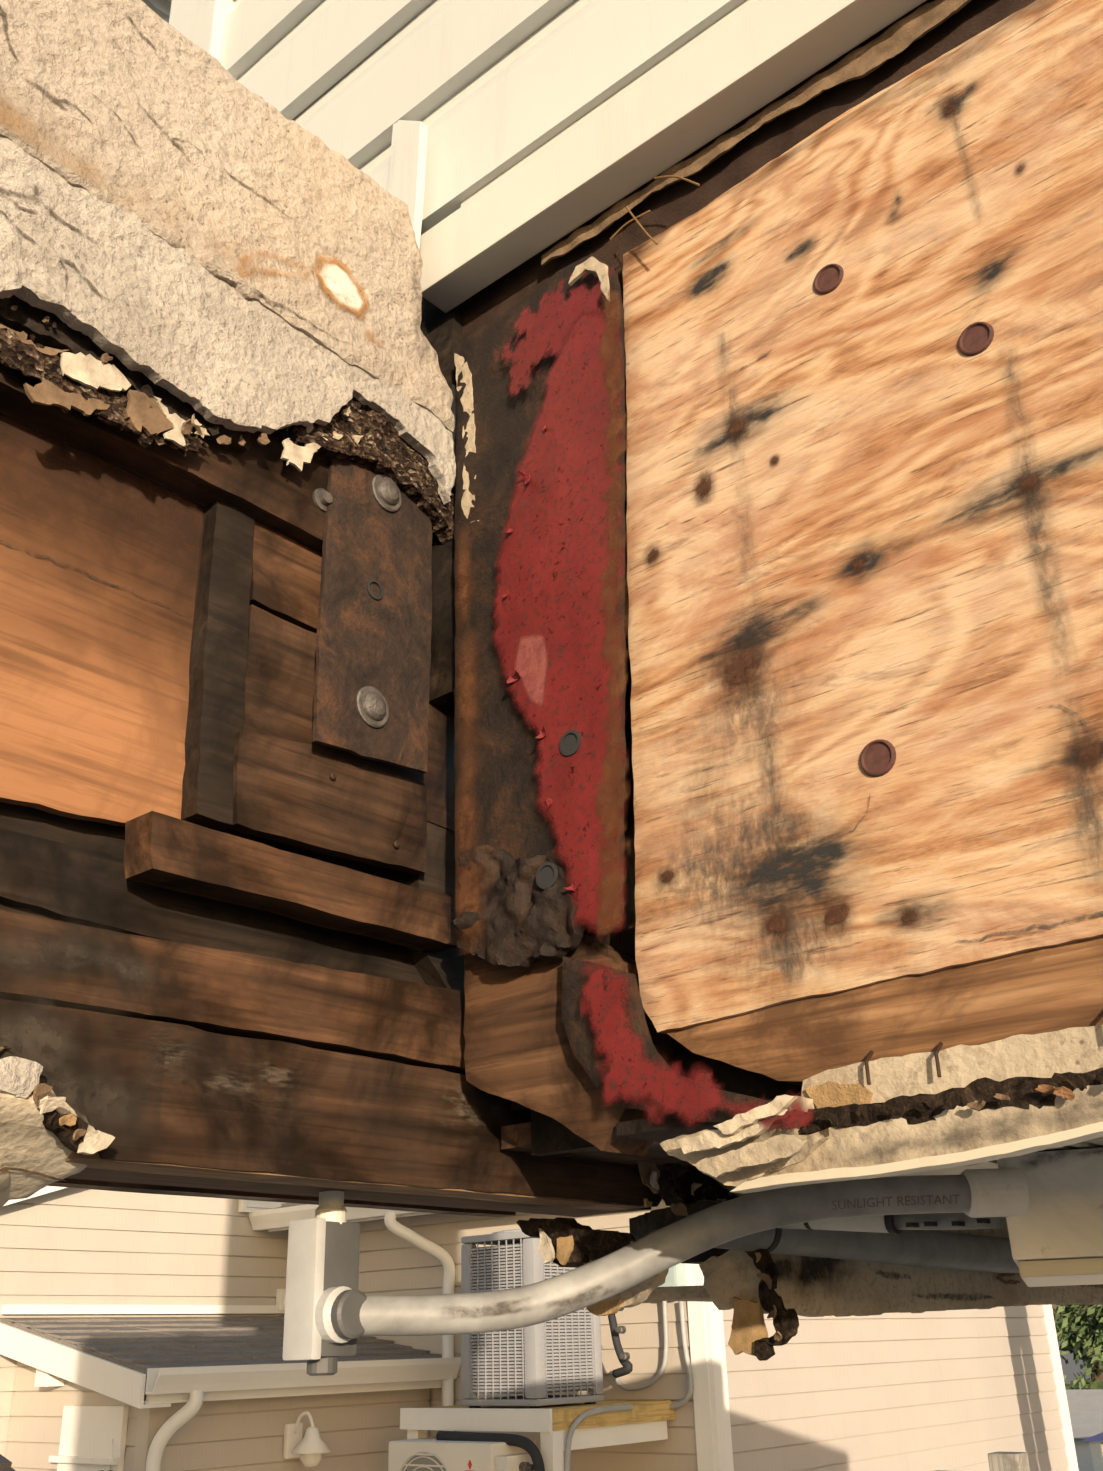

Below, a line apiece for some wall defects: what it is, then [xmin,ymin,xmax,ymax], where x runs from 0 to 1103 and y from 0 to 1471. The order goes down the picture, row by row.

crack [0,5,289,217]
water stain [942,82,975,125]
crack [0,187,103,296]
corrosion [315,256,368,318]
spalling [0,295,456,545]
water stain [960,447,1103,519]
peeling [494,268,629,934]
water stain [703,602,815,724]
water stain [659,810,850,971]
spalling [0,1046,115,1155]
peeling [580,967,812,1129]
crack [0,1167,65,1181]